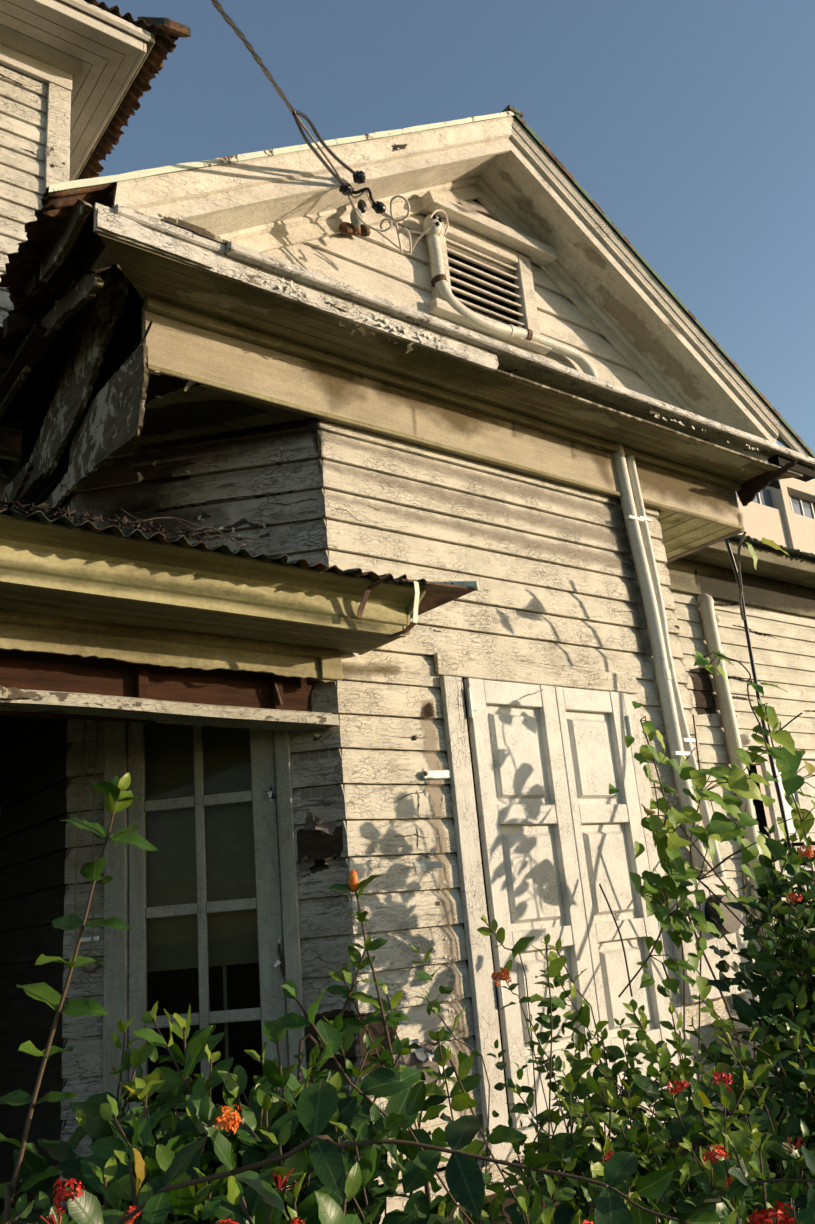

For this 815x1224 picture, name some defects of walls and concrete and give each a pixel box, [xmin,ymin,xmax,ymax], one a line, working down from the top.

damp [575,245,606,267]
damp [224,286,310,313]
damp [308,360,363,398]
damp [388,342,511,387]
damp [599,287,700,399]
damp [381,383,497,431]
damp [73,400,648,661]
damp [0,561,384,627]
damp [342,664,400,673]
peeling [297,812,345,878]